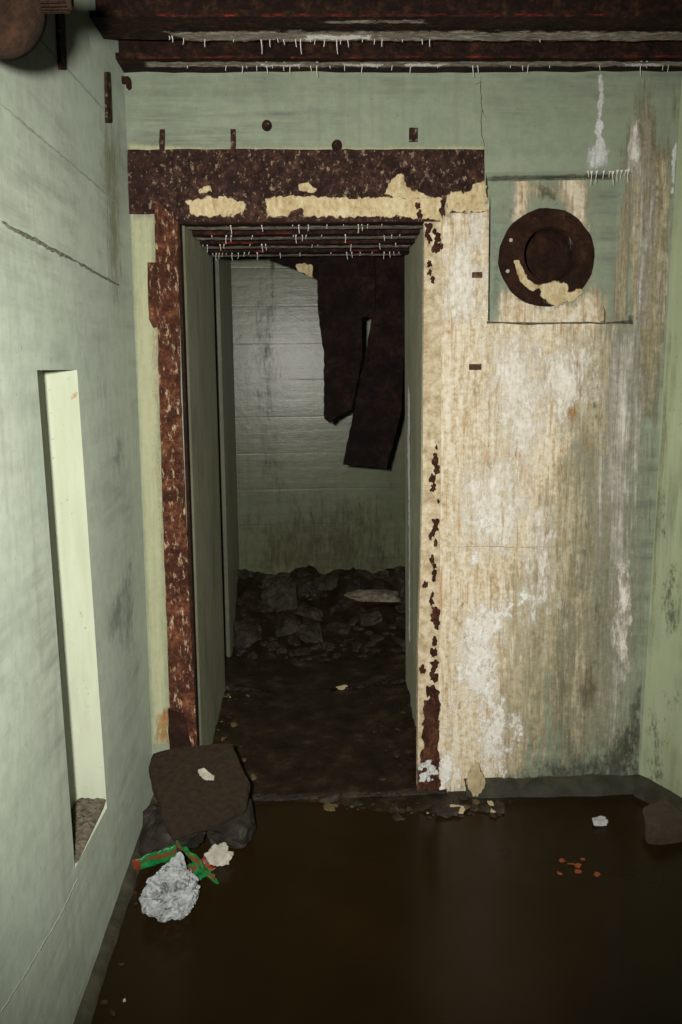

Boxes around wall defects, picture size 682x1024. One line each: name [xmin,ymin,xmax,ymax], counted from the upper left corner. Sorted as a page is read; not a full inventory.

peeling [186,186,245,218]
peeling [265,173,488,222]
crack [1,221,119,285]
rust [415,199,445,284]
leakage [418,79,671,791]
rust [429,445,440,504]
rust [417,518,441,791]
rust [157,709,168,740]